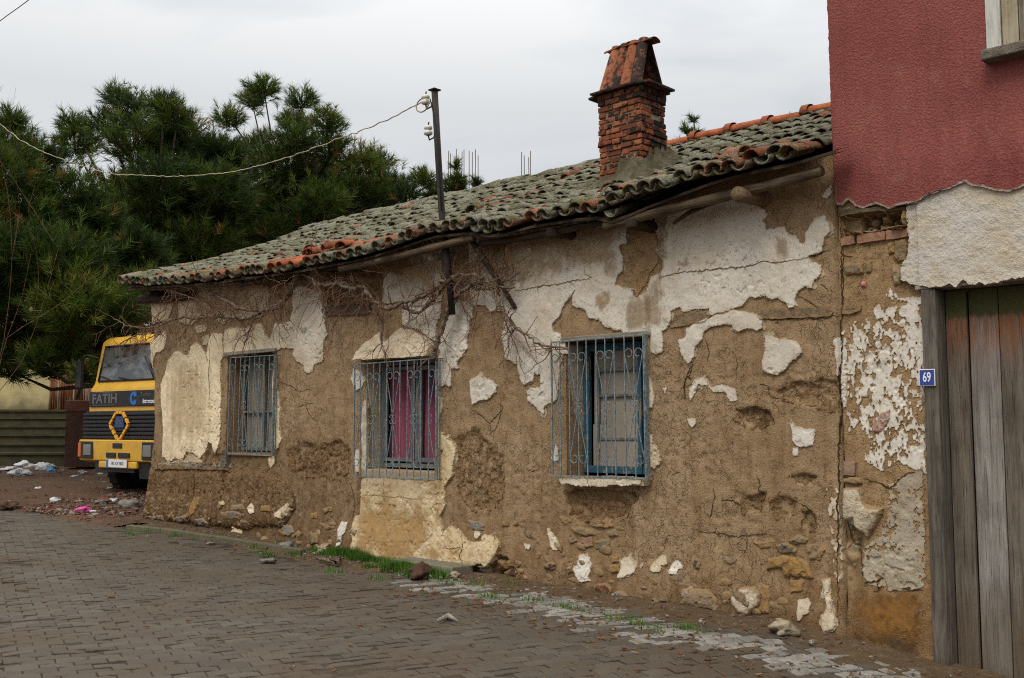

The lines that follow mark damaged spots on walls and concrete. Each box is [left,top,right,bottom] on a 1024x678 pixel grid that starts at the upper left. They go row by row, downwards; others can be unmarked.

flaking render [147,200,927,632]
crack [662,213,924,640]